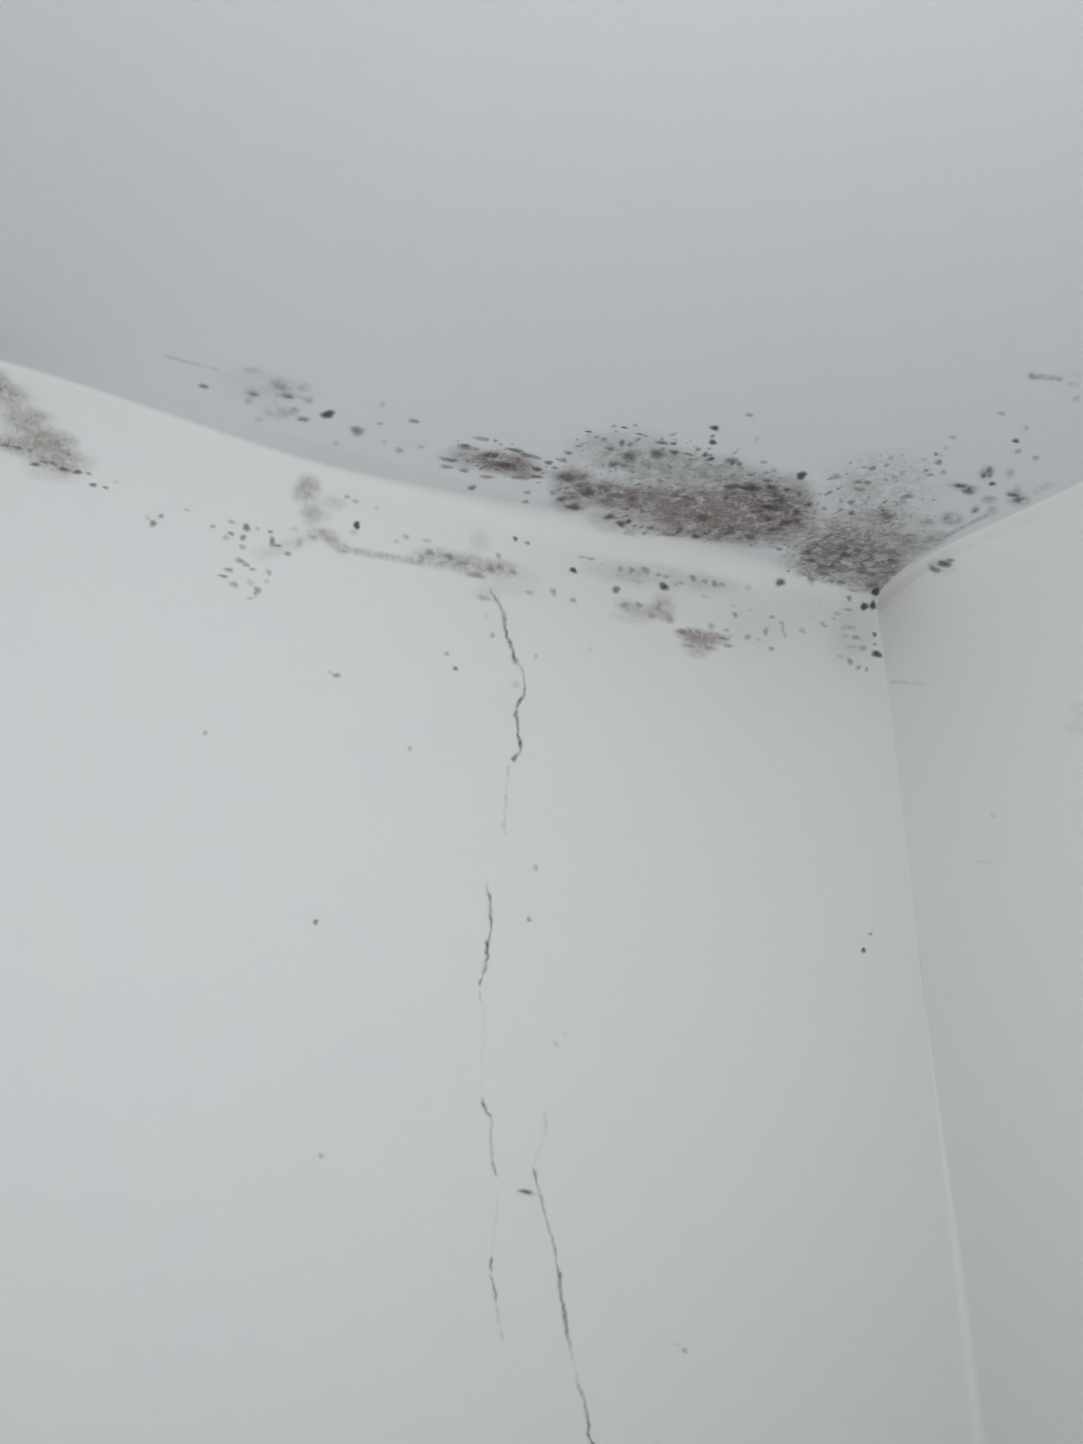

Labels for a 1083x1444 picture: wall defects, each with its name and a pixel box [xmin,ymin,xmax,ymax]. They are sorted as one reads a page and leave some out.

damp [474,426,806,540]